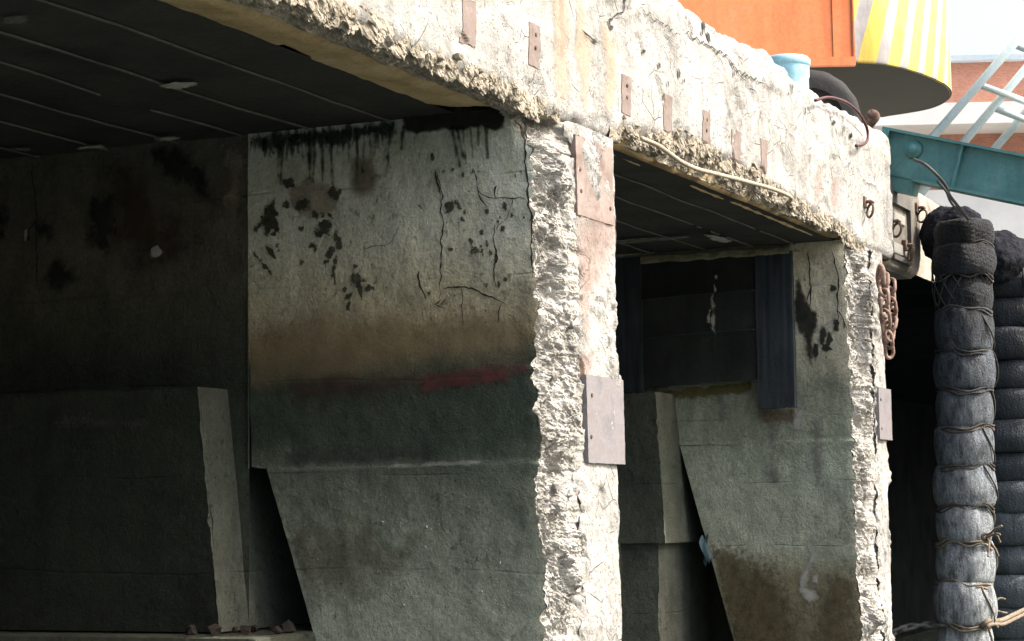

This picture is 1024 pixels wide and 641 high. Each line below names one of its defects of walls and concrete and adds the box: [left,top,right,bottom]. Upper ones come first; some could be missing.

leakage [250,107,504,185]
spalling [225,0,589,641]
crack [417,121,533,323]
spalling [608,114,886,641]
leakage [795,279,845,361]
leakage [800,541,818,602]